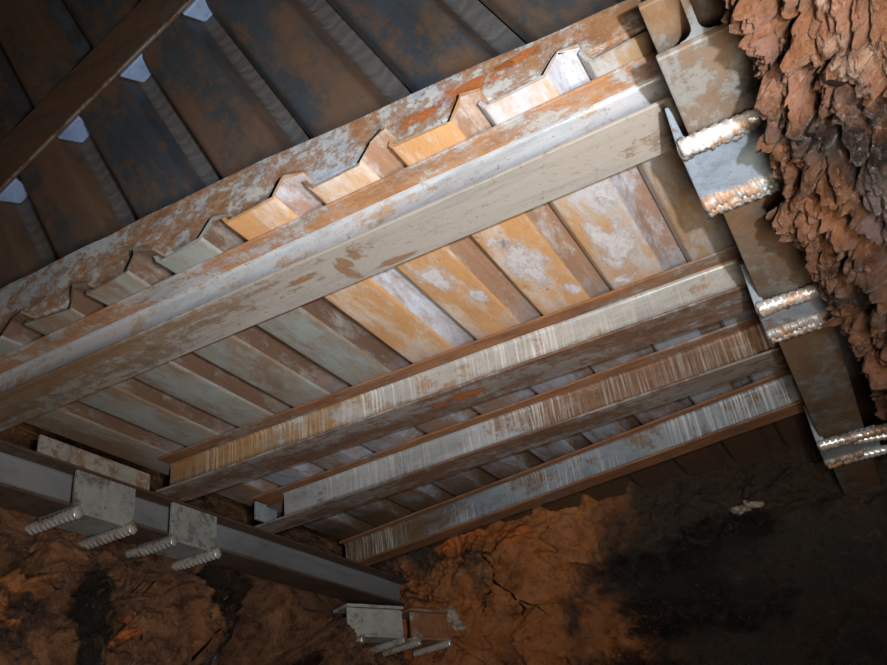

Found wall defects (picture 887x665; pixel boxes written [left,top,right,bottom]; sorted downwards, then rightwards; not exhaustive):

peeling [581,184,640,284]
peeling [408,267,457,292]
peeling [469,289,488,302]
peeling [486,237,550,286]
peeling [564,283,581,294]
crack [482,551,547,624]